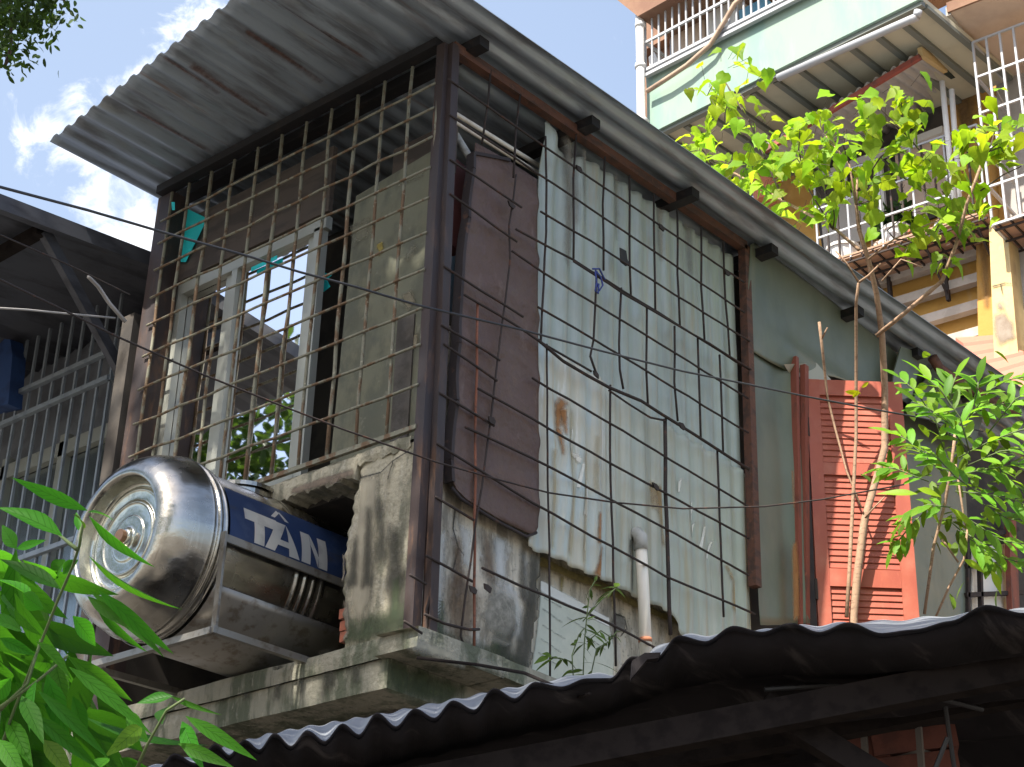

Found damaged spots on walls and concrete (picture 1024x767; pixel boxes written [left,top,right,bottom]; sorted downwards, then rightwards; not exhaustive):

corrosion [555,399,568,453]
spalling [292,470,353,493]
damp [347,475,408,623]
spalling [339,602,349,644]
damp [412,529,540,672]
damp [322,670,333,688]